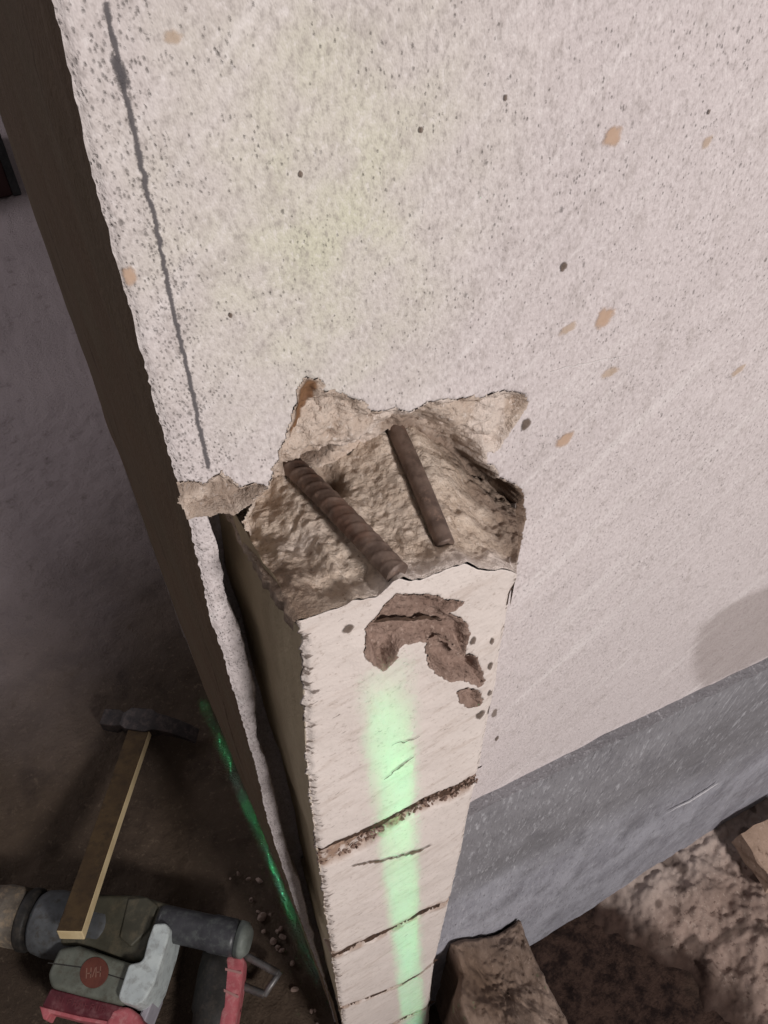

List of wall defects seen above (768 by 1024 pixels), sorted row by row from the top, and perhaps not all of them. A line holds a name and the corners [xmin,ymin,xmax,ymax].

corrosion [290,380,317,435]
spalling [176,377,531,582]
spalling [343,593,497,719]
crack [317,766,482,867]
crack [331,904,440,957]
crack [338,959,437,1011]